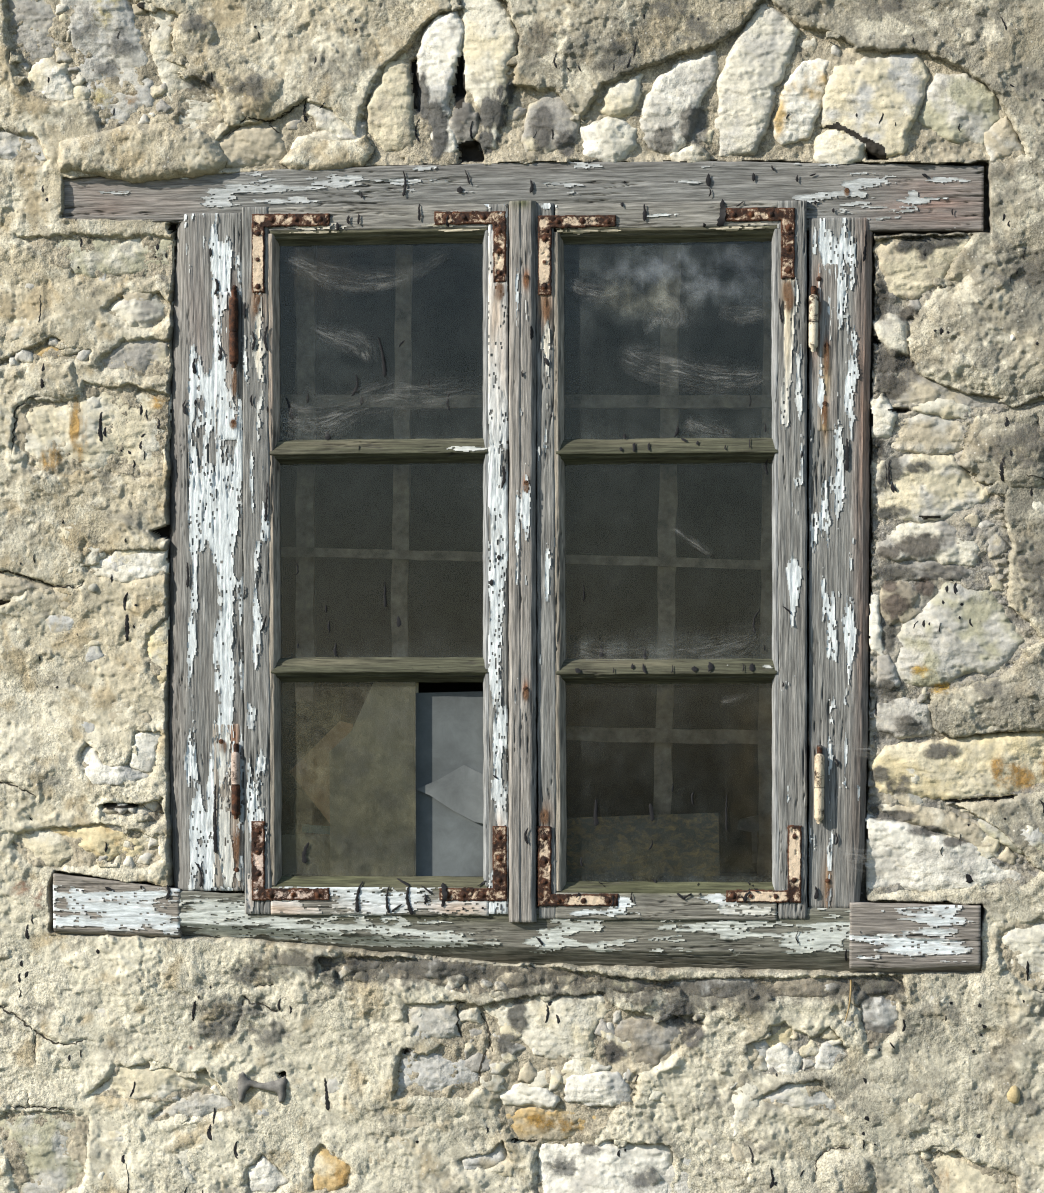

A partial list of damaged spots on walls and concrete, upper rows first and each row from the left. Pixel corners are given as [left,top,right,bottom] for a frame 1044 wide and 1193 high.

spalling [0,0,1044,948]
crack [0,570,84,588]
spalling [89,1061,235,1124]
spalling [312,955,912,1193]
spalling [0,1110,90,1193]
spalling [248,1155,289,1193]
spalling [919,1143,1017,1193]